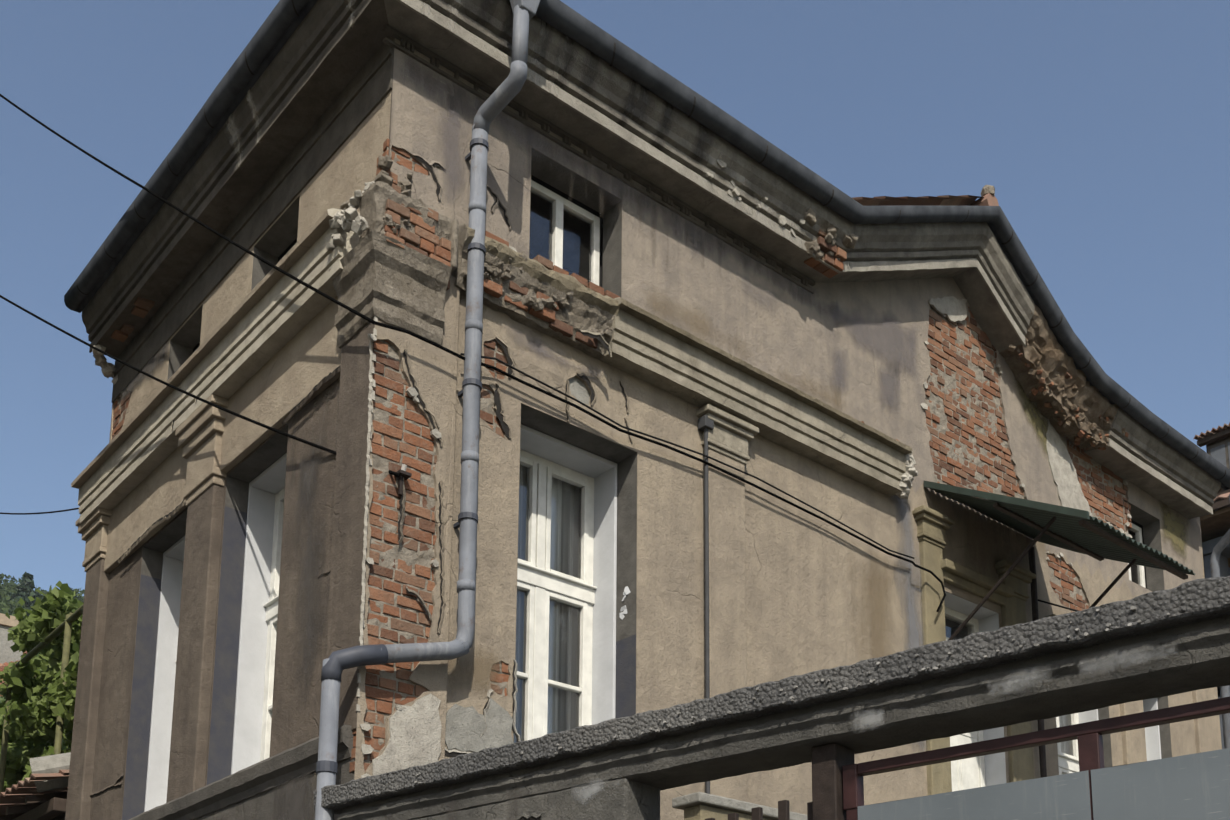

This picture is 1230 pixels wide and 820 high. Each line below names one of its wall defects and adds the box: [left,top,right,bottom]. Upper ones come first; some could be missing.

spalling [326,138,451,291]
crack [413,153,446,200]
crack [487,185,512,230]
flaking render [112,391,132,439]
flaking render [480,340,507,438]
flaking render [568,372,597,406]
water stain [835,310,914,404]
flaking render [920,296,1025,499]
flaking render [359,316,442,645]
flaking render [1046,419,1133,538]
flaking render [1046,551,1142,639]
flaking render [349,661,428,778]